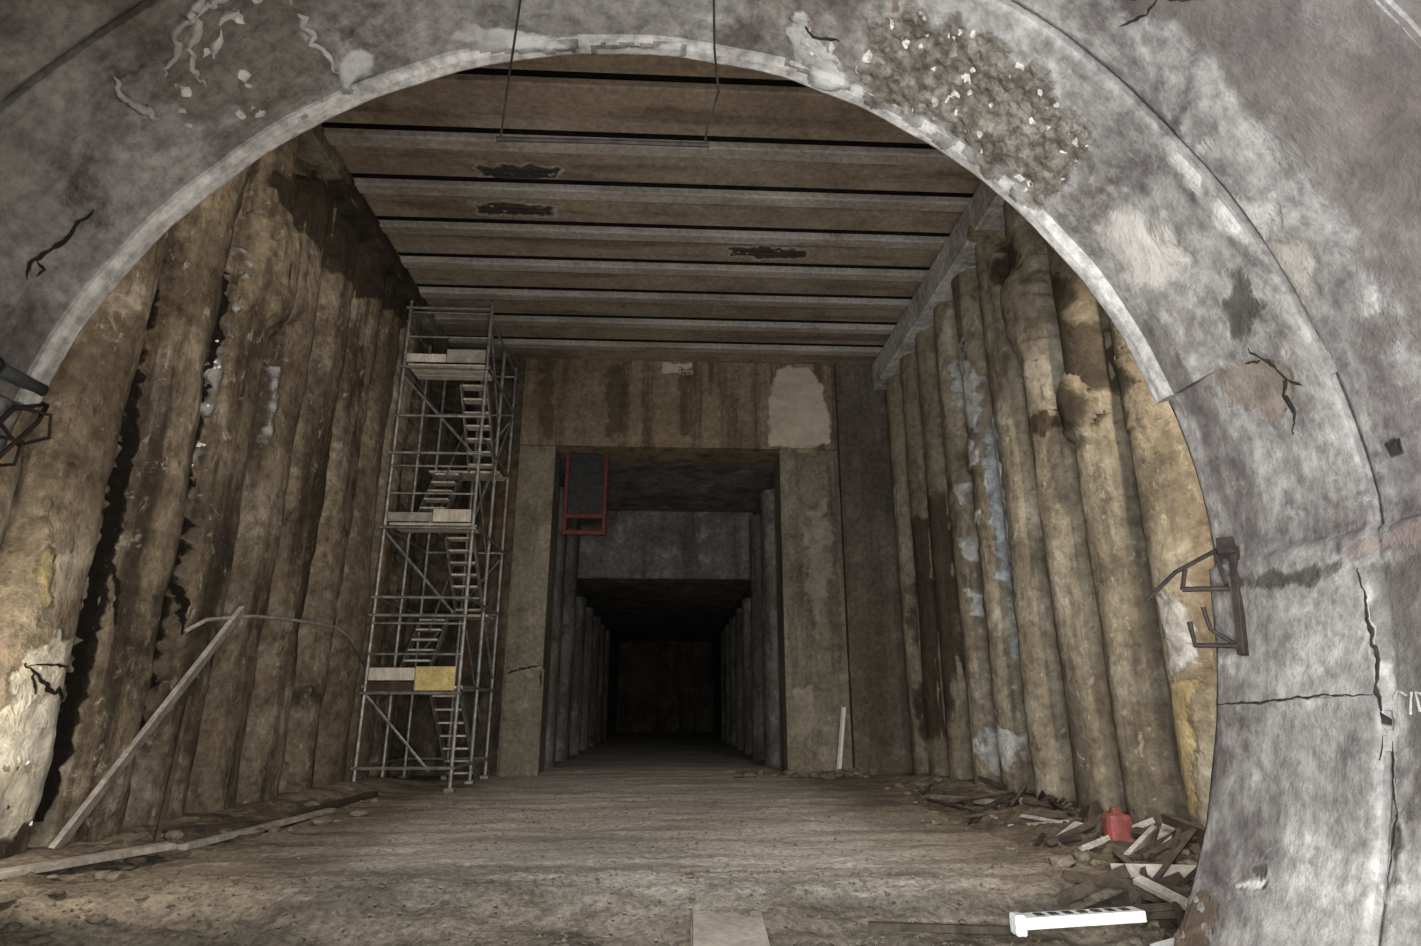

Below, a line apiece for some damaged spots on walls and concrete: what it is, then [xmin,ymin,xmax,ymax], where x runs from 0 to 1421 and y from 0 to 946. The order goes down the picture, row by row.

crack [1120,0,1195,27]
water stain [334,41,381,95]
spalling [780,0,1097,212]
crack [25,209,94,280]
crack [1245,348,1302,435]
crack [1216,568,1399,888]